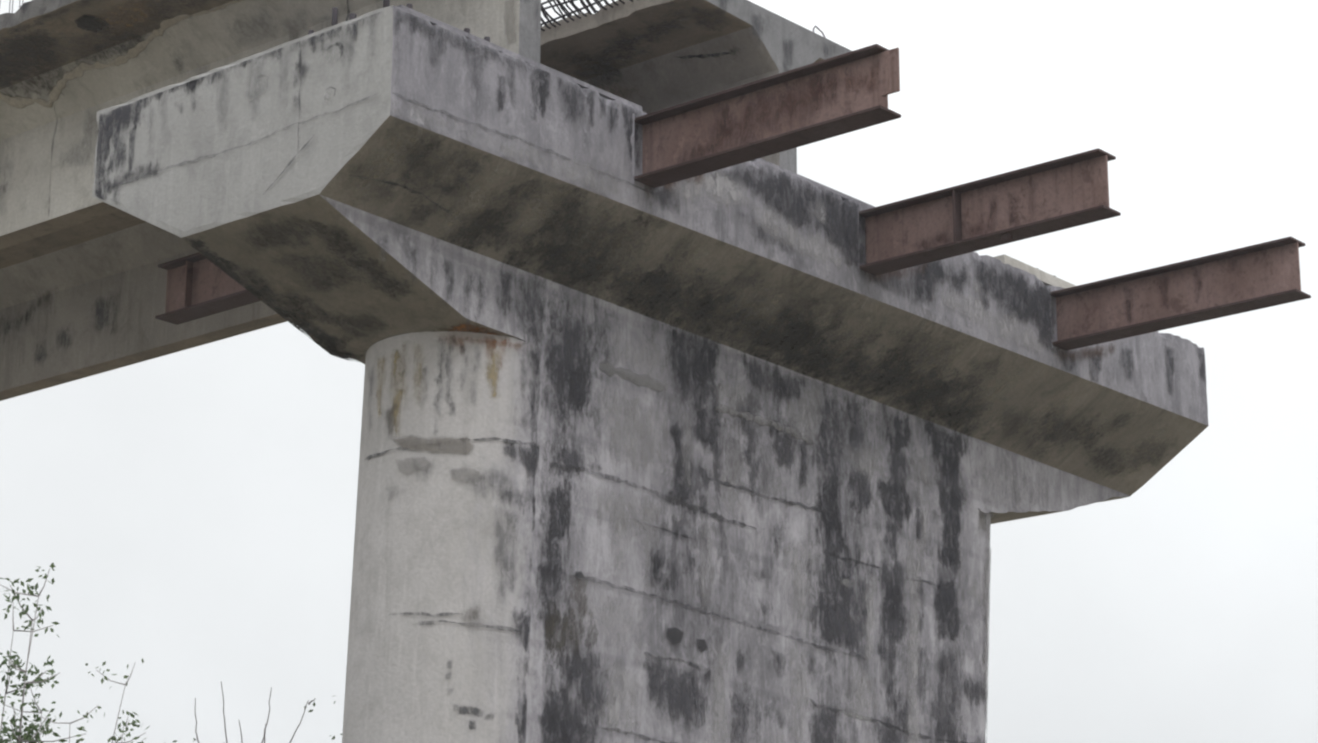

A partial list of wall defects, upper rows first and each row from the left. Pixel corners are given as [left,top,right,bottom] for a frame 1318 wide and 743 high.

damp [95,72,220,200]
damp [701,168,1133,378]
corrosion [433,324,519,397]
damp [1166,350,1174,392]
damp [451,180,999,743]